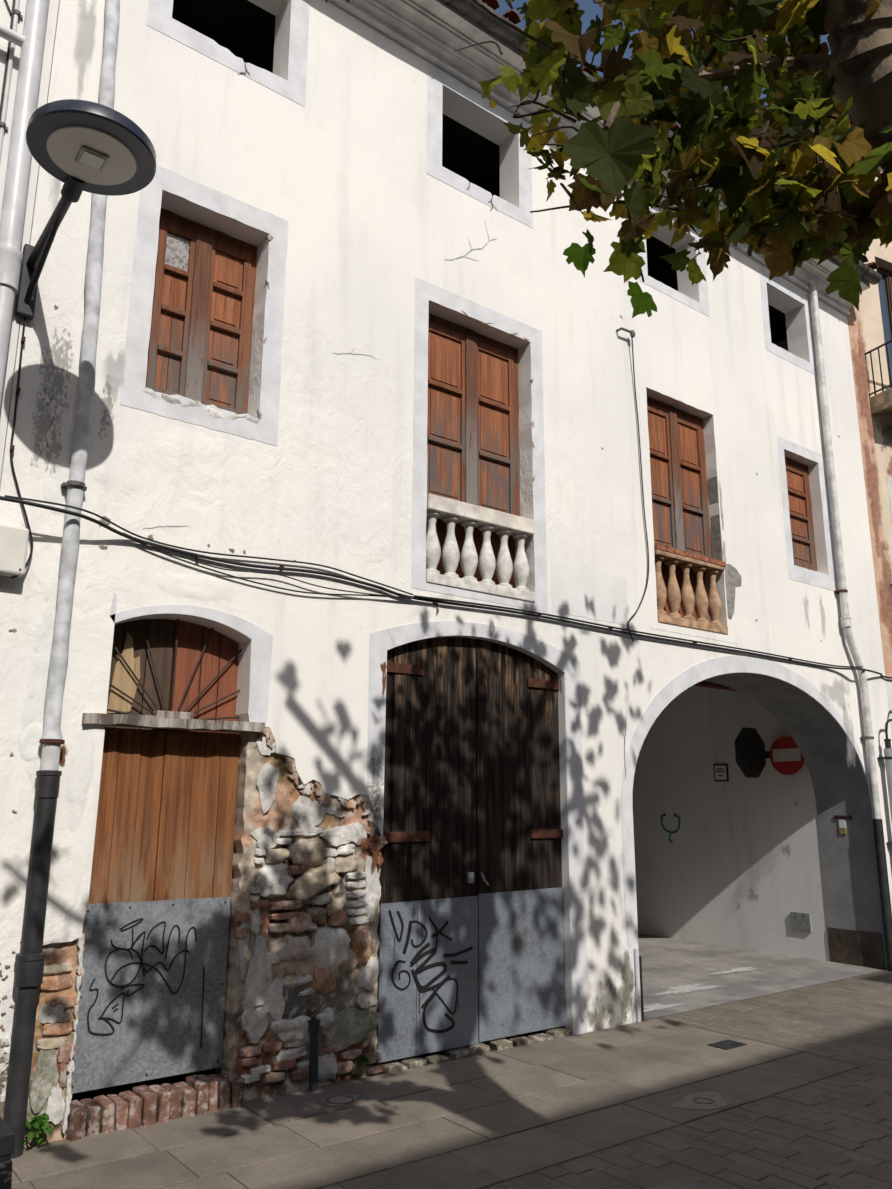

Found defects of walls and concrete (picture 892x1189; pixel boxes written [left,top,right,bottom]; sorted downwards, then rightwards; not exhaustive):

crack [444,182,497,261]
peeling [853,339,892,639]
peeling [0,995,14,1119]
flaking render [24,924,86,1148]
flaking render [215,727,388,1102]
water stain [582,952,634,1030]